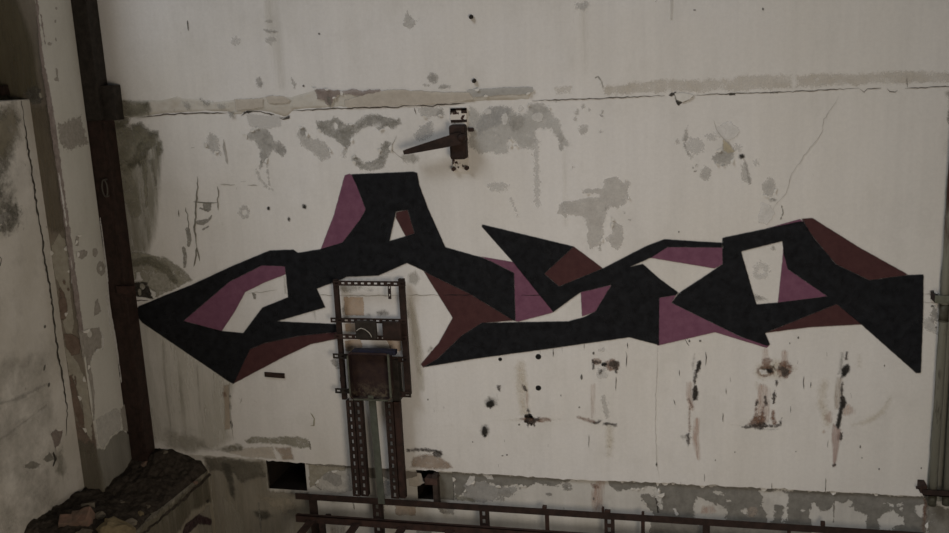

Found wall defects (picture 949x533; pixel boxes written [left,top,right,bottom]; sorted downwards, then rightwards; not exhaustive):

water stain [0,0,38,232]
water stain [31,107,61,232]
flaking render [302,85,381,106]
flaking render [298,115,400,170]
peeling [468,87,567,153]
crack [537,94,660,102]
crack [706,86,949,209]
peeling [25,0,122,441]
peeling [559,177,629,249]
corrosion [758,359,791,385]
flaking render [452,472,572,503]
flaking render [609,481,929,533]